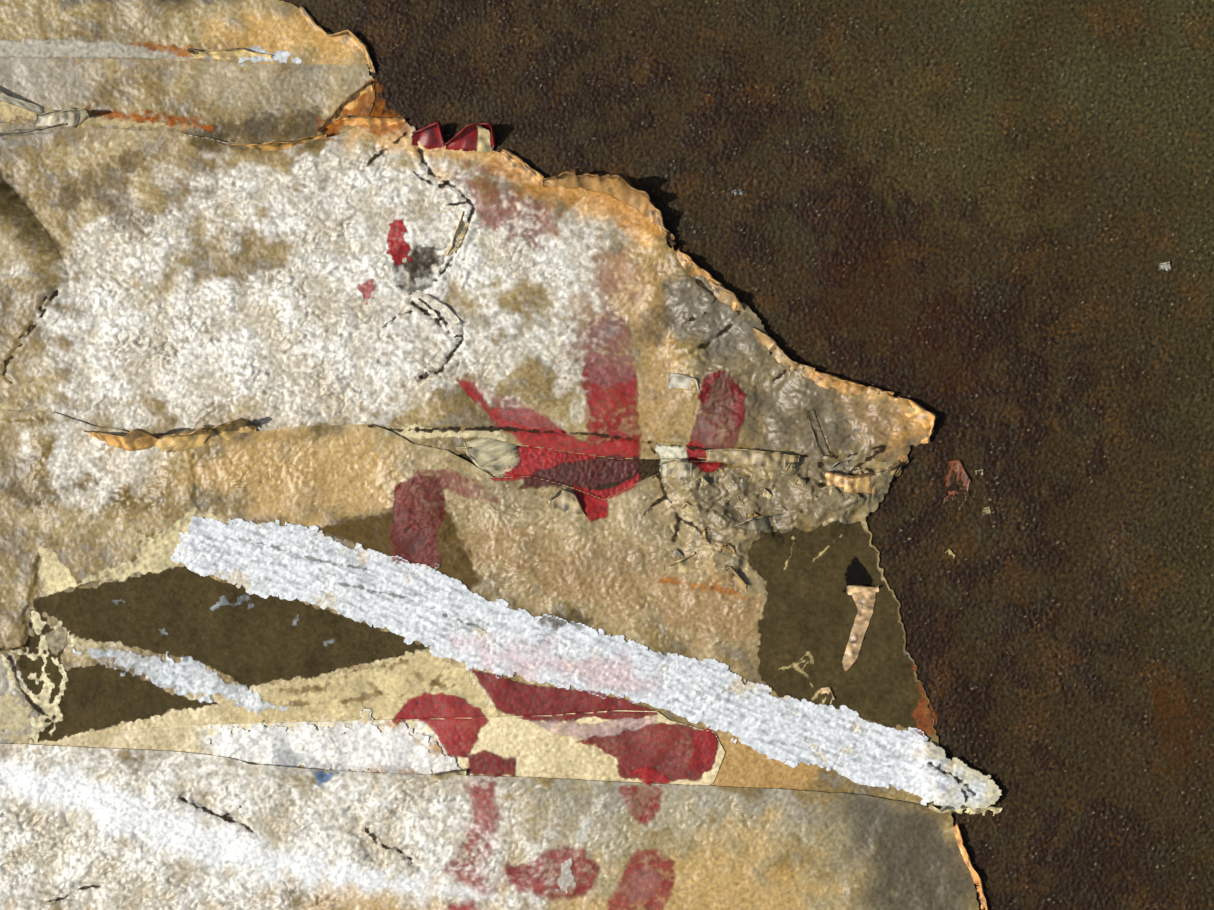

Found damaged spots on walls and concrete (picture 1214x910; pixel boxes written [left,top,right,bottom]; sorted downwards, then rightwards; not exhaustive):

peeling [0,94,195,149]
peeling [215,6,745,325]
peeling [752,327,937,445]
peeling [84,417,256,453]
peeling [385,423,521,477]
peeling [655,444,800,480]
peeling [824,457,908,494]
peeling [0,507,498,747]
peeling [718,514,922,728]
rust [910,663,937,736]
peeling [430,769,466,780]
peeling [929,805,1002,910]